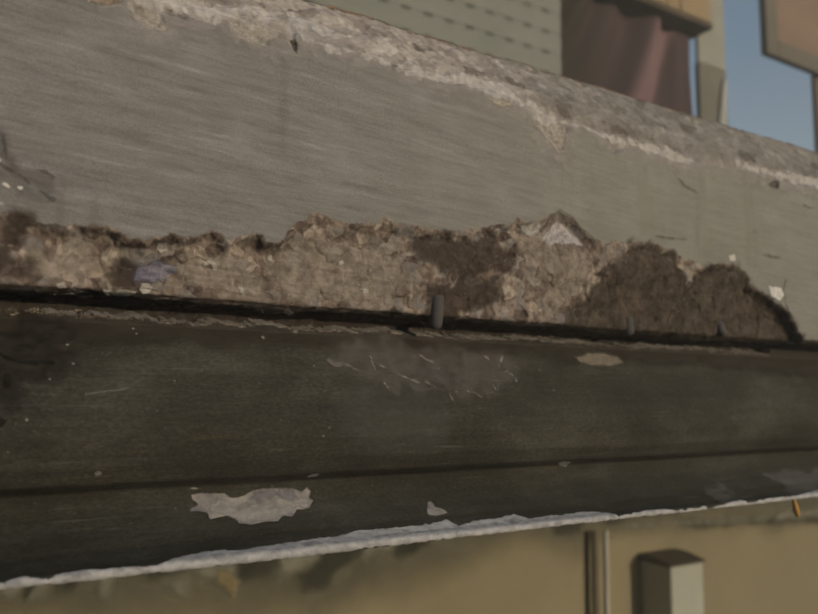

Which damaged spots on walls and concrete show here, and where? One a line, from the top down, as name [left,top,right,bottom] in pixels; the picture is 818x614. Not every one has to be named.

spalling [88,0,818,189]
spalling [0,202,802,355]
water stain [0,532,511,610]
spalling [0,487,818,598]
water stain [529,497,818,536]